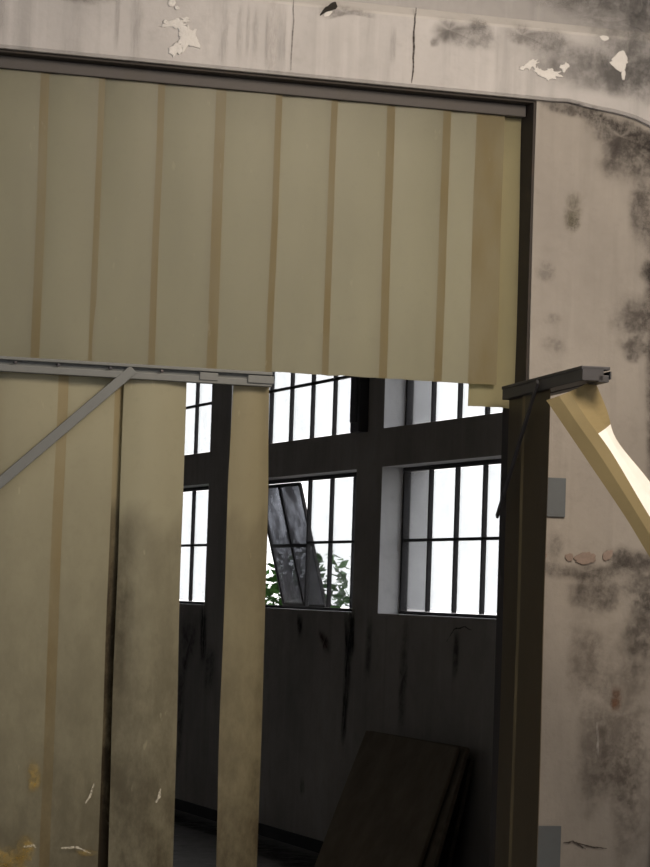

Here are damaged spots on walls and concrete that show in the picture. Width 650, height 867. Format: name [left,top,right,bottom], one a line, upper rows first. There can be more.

peeling [159,0,200,57]
crack [409,10,417,89]
peeling [519,59,570,81]
peeling [609,50,628,80]
crack [564,841,607,849]